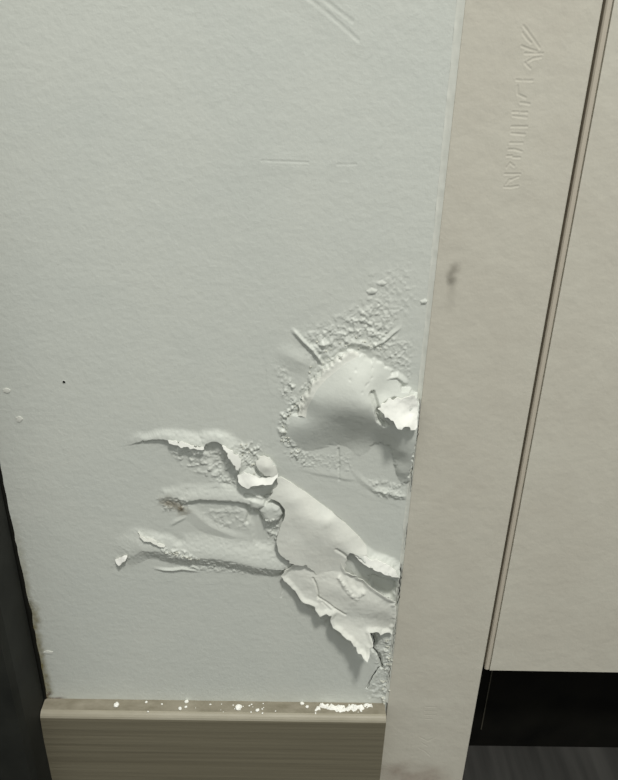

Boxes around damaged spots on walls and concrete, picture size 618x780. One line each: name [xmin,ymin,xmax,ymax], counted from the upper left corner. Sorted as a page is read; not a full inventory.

peeling [113,424,402,704]